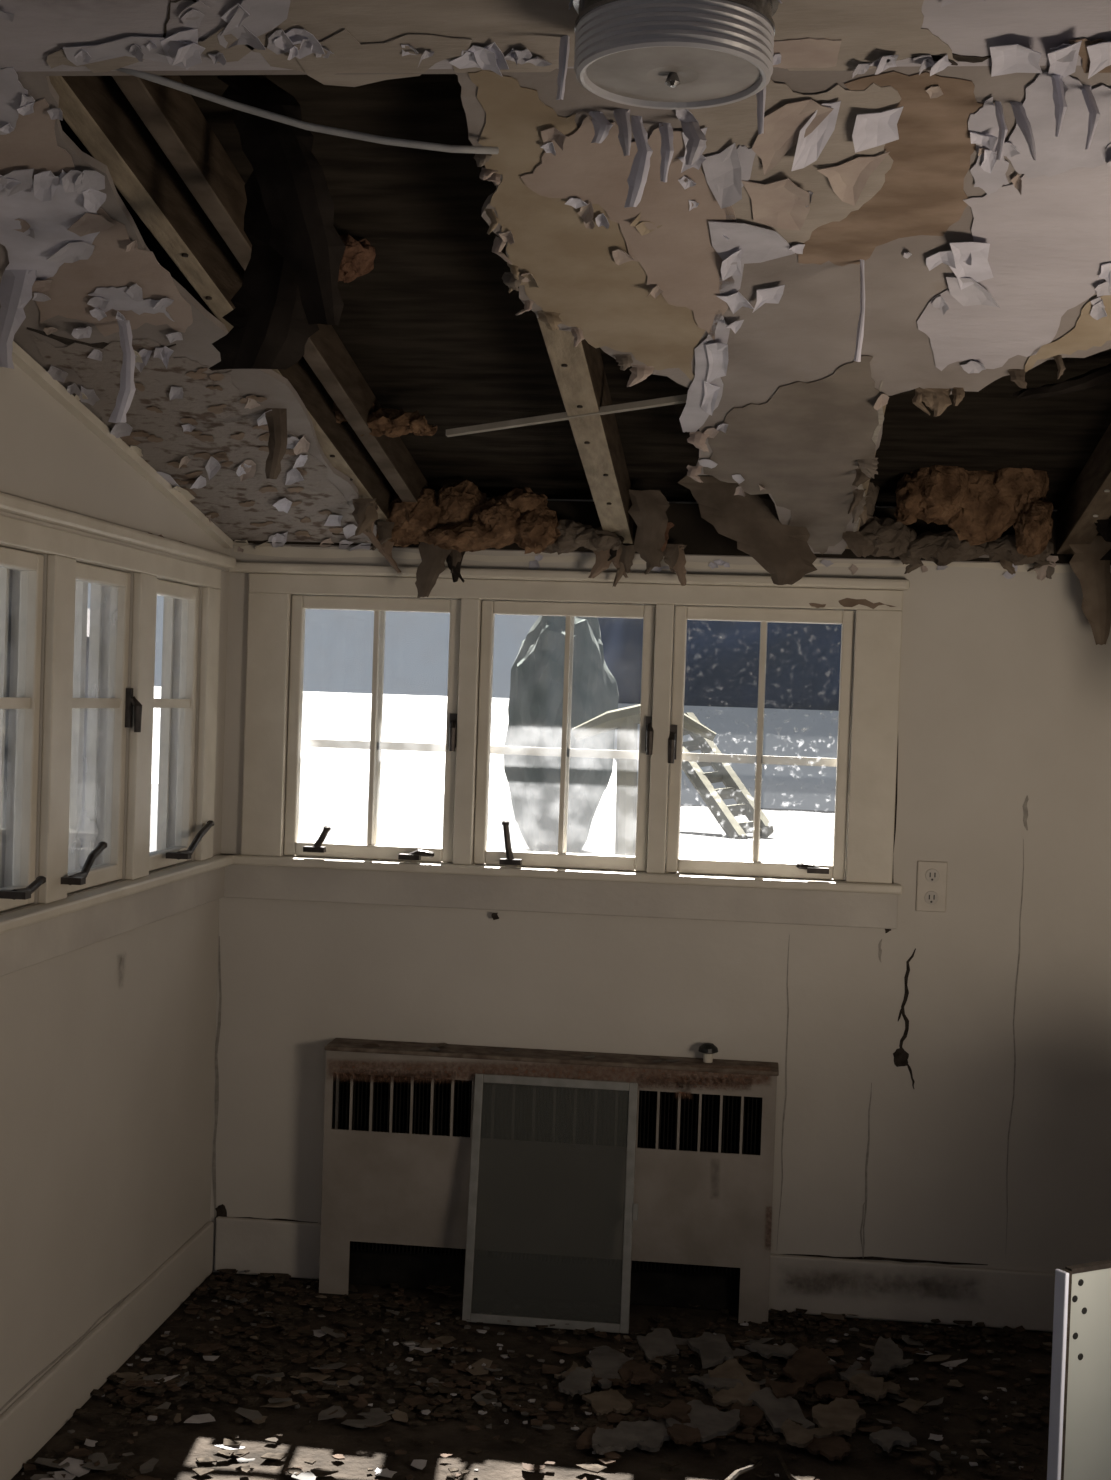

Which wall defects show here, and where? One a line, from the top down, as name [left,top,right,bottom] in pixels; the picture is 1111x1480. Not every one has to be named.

peeling [0,0,1111,579]
crack [777,795,1029,1265]